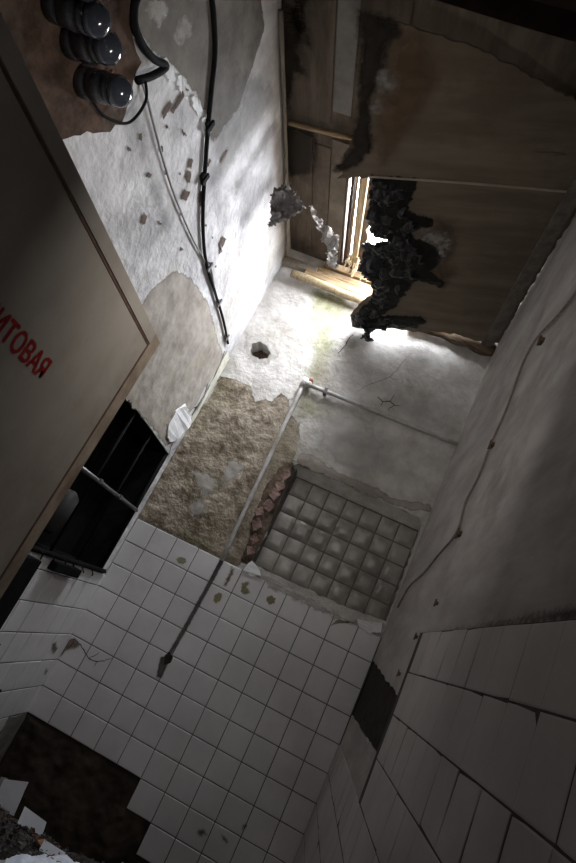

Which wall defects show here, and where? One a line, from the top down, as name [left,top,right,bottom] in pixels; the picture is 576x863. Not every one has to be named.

flaking render [126,271,431,577]
peeling [0,712,150,863]